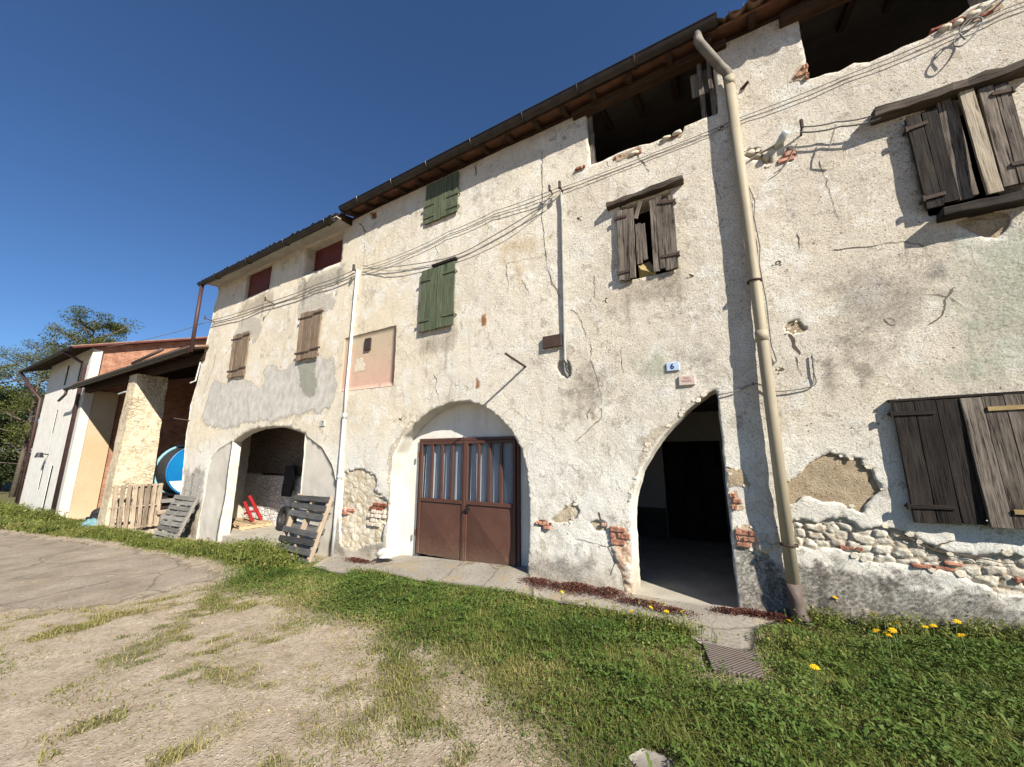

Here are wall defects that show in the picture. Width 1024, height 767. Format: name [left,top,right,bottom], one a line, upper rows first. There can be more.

crack [833,241,924,250]
crack [506,152,602,441]
flaking render [785,321,806,334]
crack [928,287,961,325]
flaking render [340,415,418,549]
flaking render [727,468,751,511]
peeling [536,502,579,529]
flaking render [590,520,633,594]
flaking render [734,525,756,551]
flaking render [787,453,1024,594]